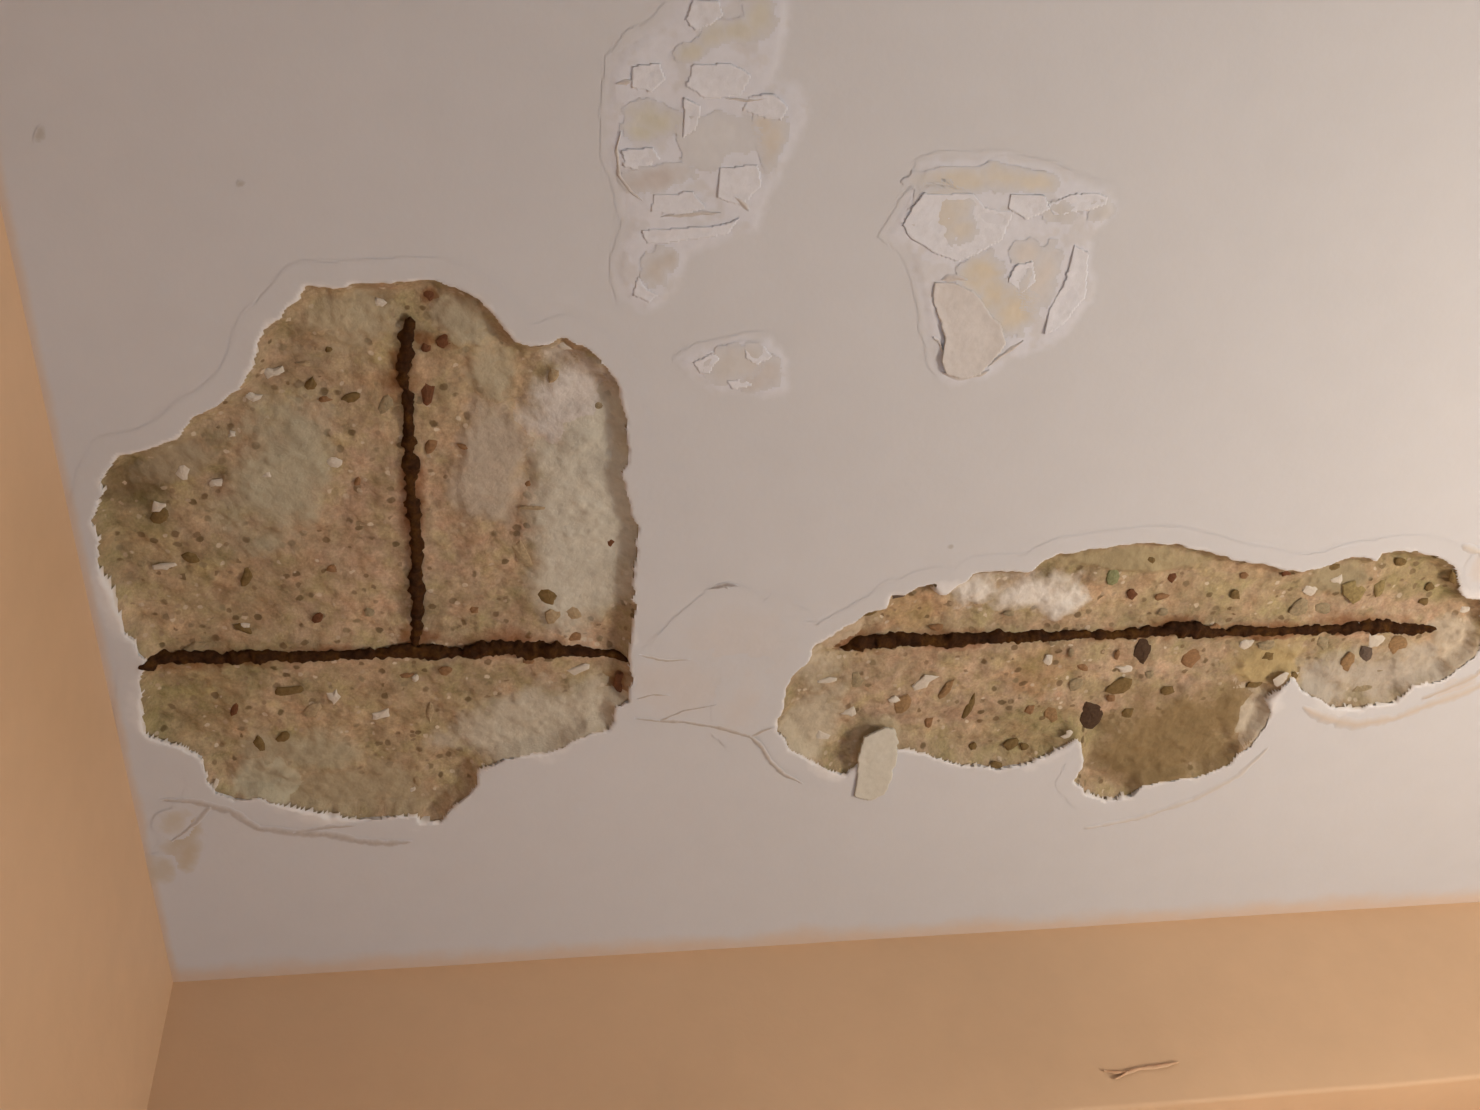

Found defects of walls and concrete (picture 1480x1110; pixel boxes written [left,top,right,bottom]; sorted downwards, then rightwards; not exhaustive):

spalling [68,257,662,839]
spalling [758,526,1480,830]